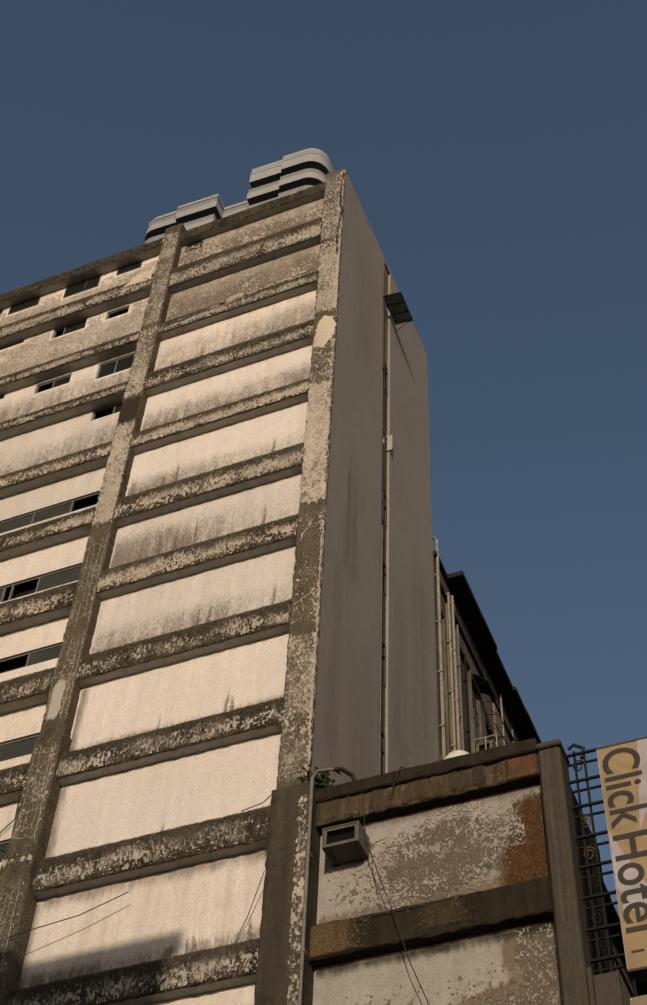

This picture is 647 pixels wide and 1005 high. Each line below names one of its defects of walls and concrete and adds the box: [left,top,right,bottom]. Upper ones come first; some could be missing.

peeling [0,170,346,839]
damp [81,593,290,663]
peeling [0,815,267,944]
damp [316,765,486,821]
peeling [287,795,525,1005]
rust [497,792,550,886]
peeling [7,949,258,1005]
peeling [437,923,563,1005]